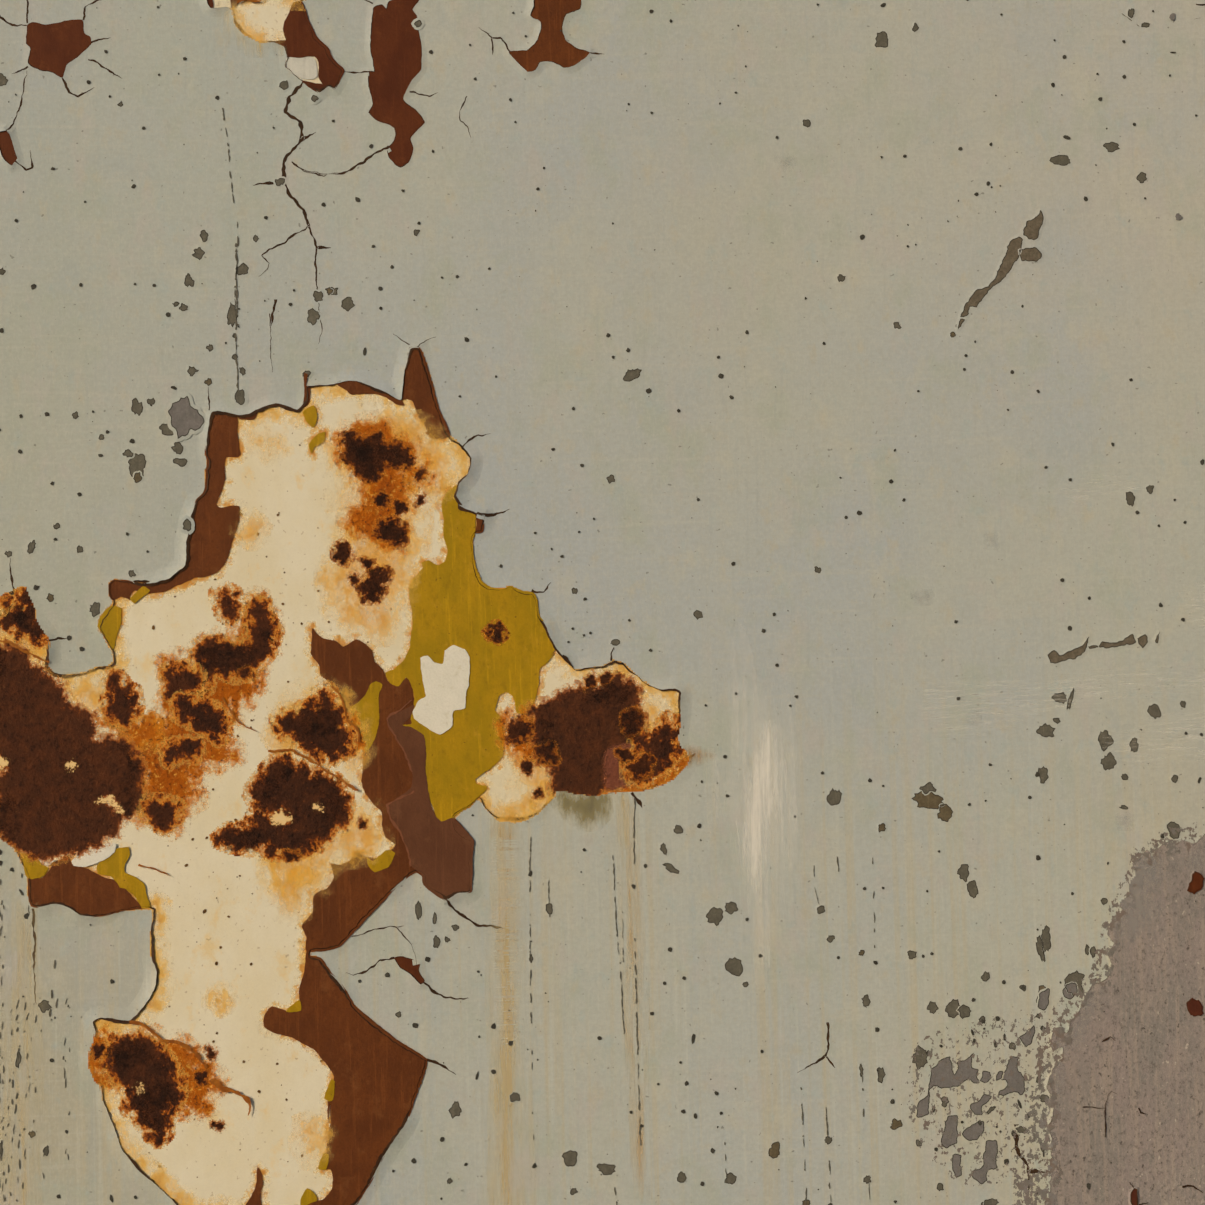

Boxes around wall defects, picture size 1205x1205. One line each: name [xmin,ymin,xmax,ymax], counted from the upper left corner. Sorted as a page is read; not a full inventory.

peeling [478,0,605,79]
peeling [0,0,123,173]
peeling [198,0,438,177]
crack [252,79,338,391]
spalling [1018,207,1046,265]
spalling [1088,629,1162,652]
peeling [1034,685,1077,740]
peeling [0,336,698,1205]
peeling [909,779,956,824]
peeling [1095,728,1141,782]
crack [351,924,420,965]
peeling [887,818,1205,1205]